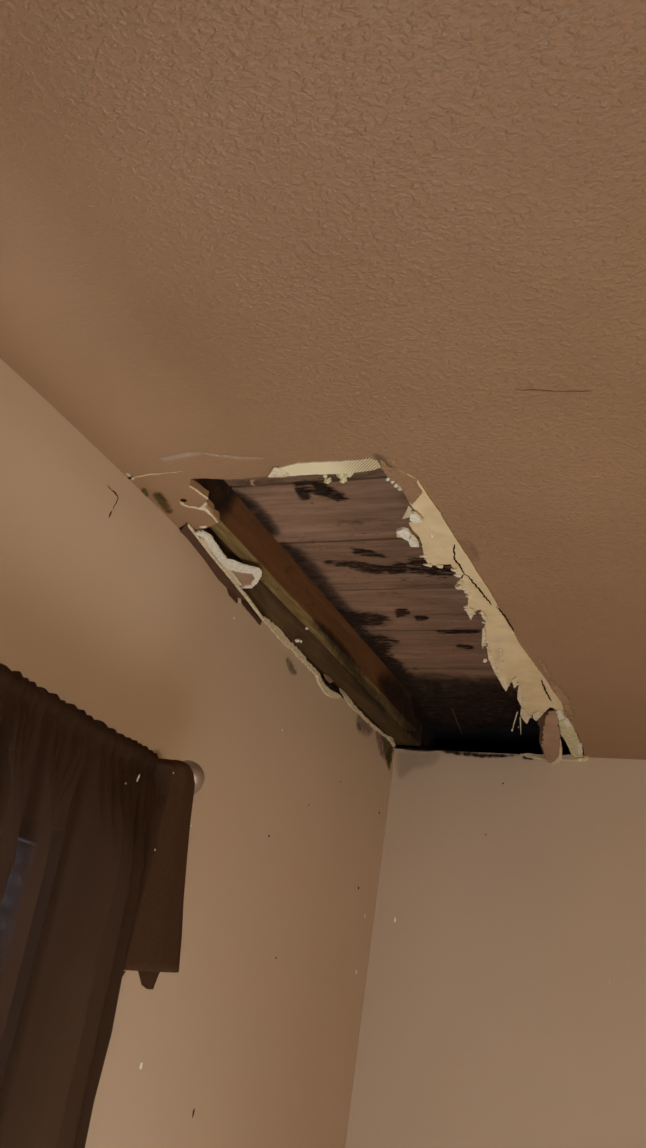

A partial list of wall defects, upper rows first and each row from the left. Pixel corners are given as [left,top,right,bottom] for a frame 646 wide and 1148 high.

peeling [396,511,423,547]
peeling [180,522,321,678]
water stain [200,478,533,768]
spalling [339,688,396,747]
peeling [556,709,572,727]